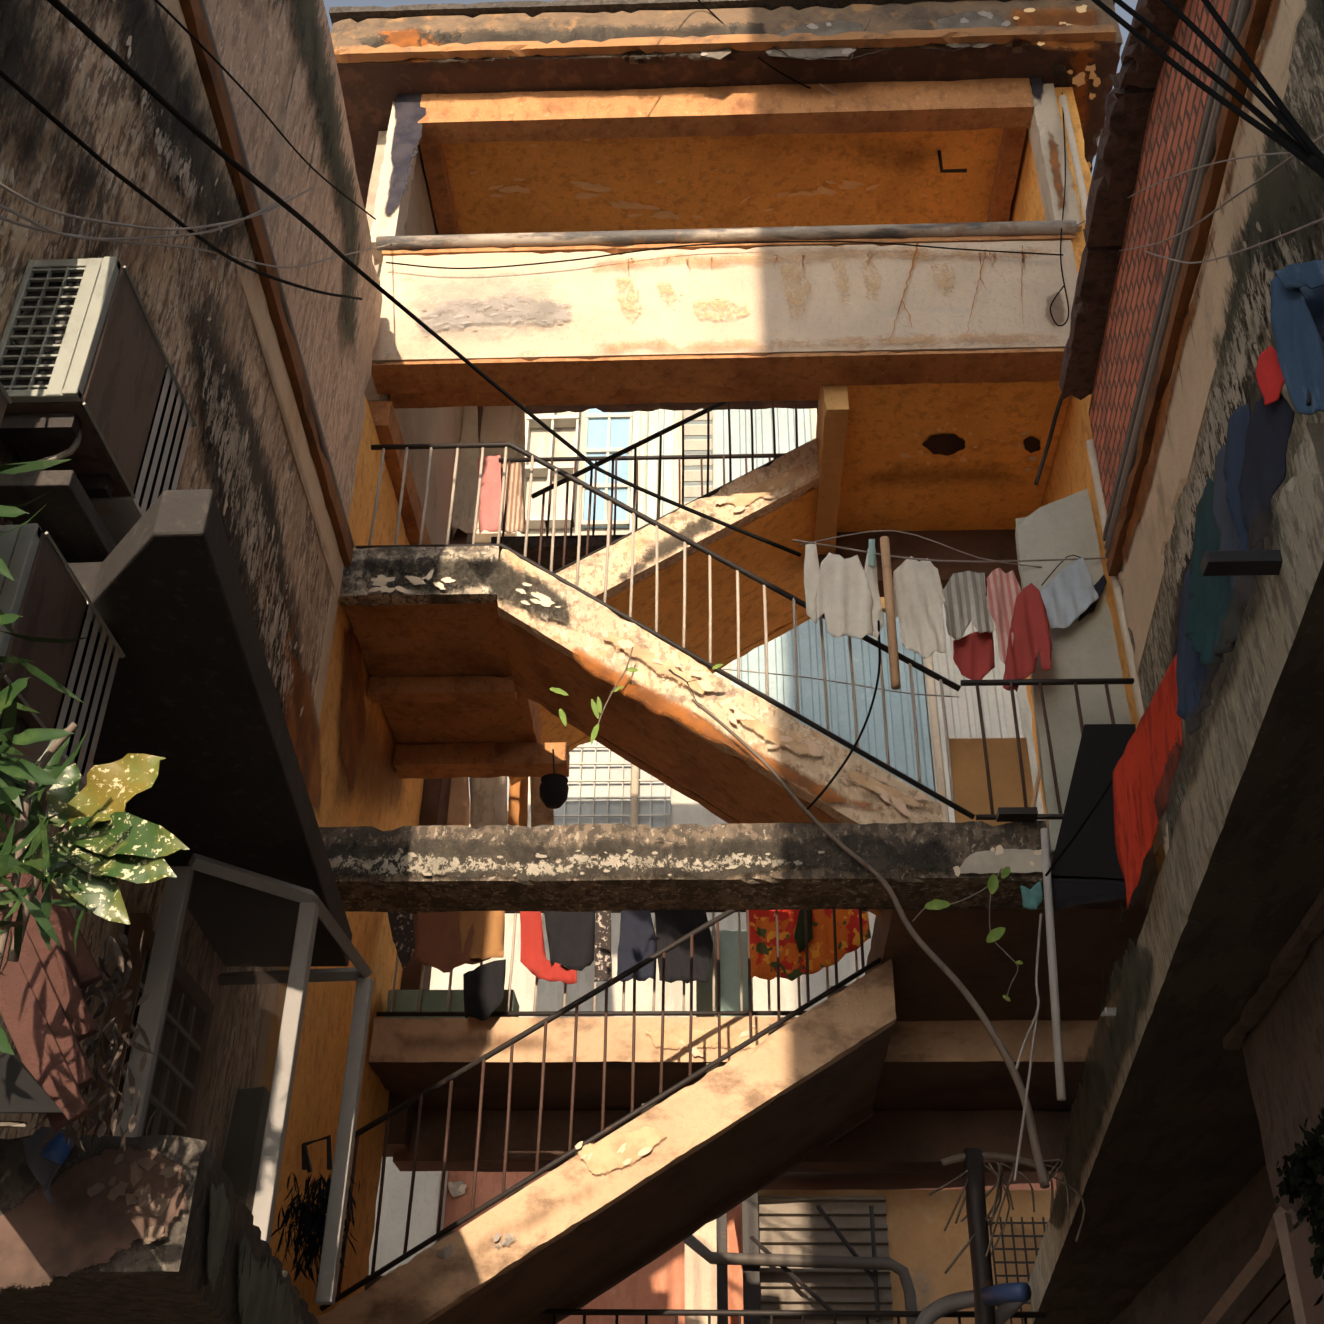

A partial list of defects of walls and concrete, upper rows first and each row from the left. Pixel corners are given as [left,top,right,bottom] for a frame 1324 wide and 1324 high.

spalling [701,47,732,59]
leakage [0,0,119,259]
leakage [77,0,261,275]
leakage [268,0,363,364]
leakage [385,94,426,215]
crack [890,243,919,339]
crack [966,249,988,341]
leakage [179,265,302,708]
peeling [368,556,568,622]
peeling [329,848,830,880]
peeling [953,845,1043,877]
peeling [0,1145,187,1291]